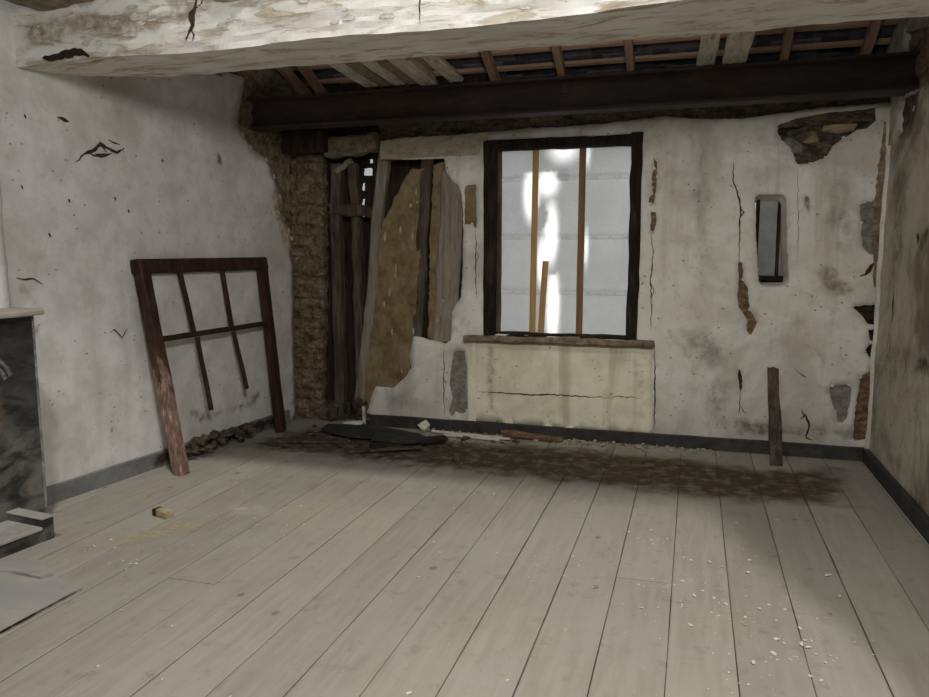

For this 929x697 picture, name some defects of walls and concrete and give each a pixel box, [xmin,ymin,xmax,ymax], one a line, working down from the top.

crack [76,139,125,162]
flaking render [777,122,874,165]
crack [731,161,744,258]
flaking render [859,198,879,254]
crack [483,237,656,426]
flaking render [737,262,757,335]
flaking render [851,305,875,357]
flaking render [449,351,468,416]
flaking render [829,372,870,444]